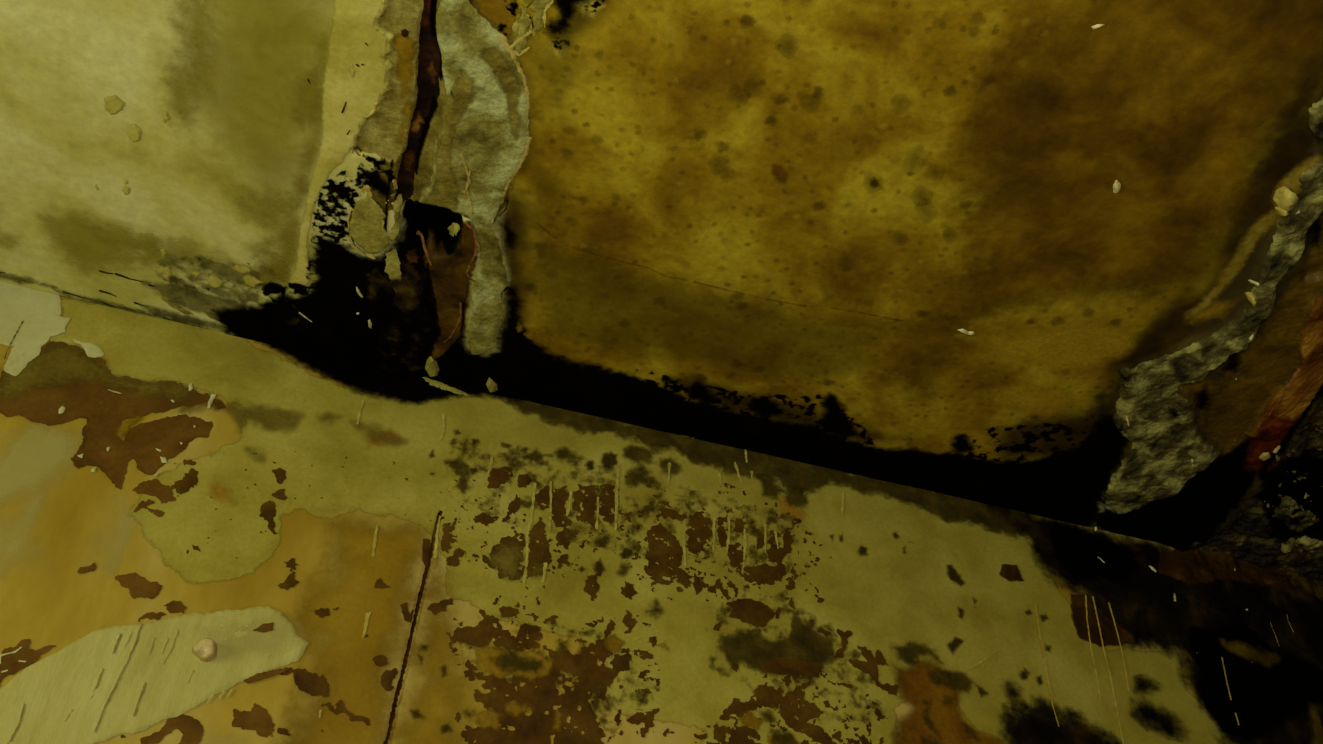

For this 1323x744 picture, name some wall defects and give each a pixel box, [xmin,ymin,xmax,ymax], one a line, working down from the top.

leakage [176,0,322,174]
spalling [287,0,553,355]
peeling [0,299,1231,744]
leakage [45,145,1323,744]
leakage [500,0,1323,461]
corrosion [1245,294,1323,471]